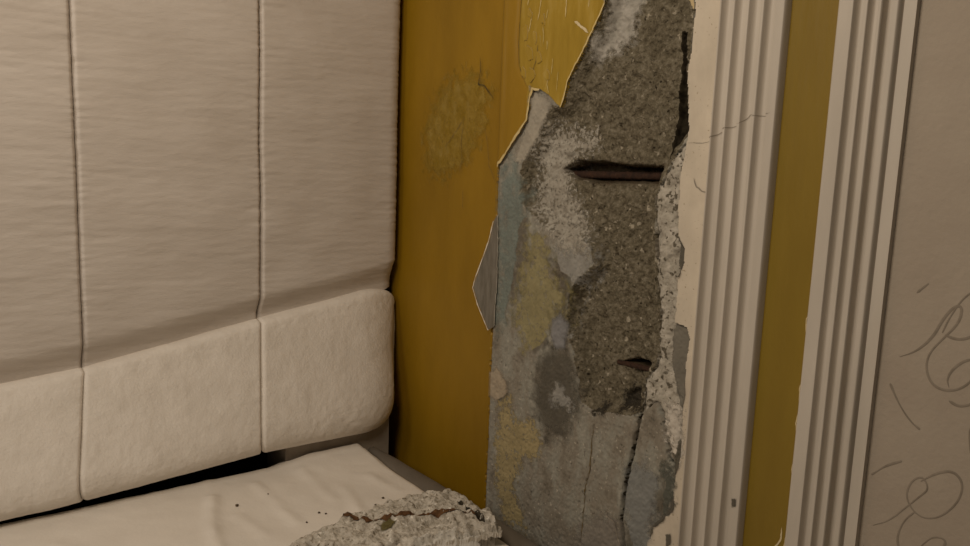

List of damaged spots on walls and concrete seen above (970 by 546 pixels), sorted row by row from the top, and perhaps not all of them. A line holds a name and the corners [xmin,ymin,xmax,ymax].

corrosion [566,161,664,185]
spalling [472,0,696,546]
crack [581,391,647,546]